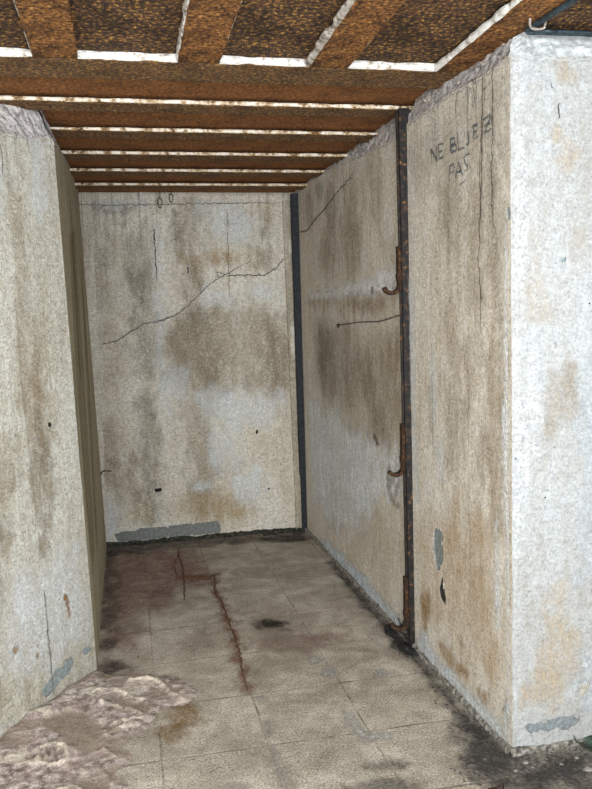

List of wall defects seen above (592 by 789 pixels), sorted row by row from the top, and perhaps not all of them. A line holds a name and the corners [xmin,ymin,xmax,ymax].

crack [299,174,353,233]
crack [455,68,495,333]
crack [79,202,285,345]
leakage [495,175,543,629]
flaking render [431,525,444,570]
peeling [41,657,74,699]
corrosion [178,573,251,690]
leakage [418,631,517,736]
peeling [524,713,584,738]